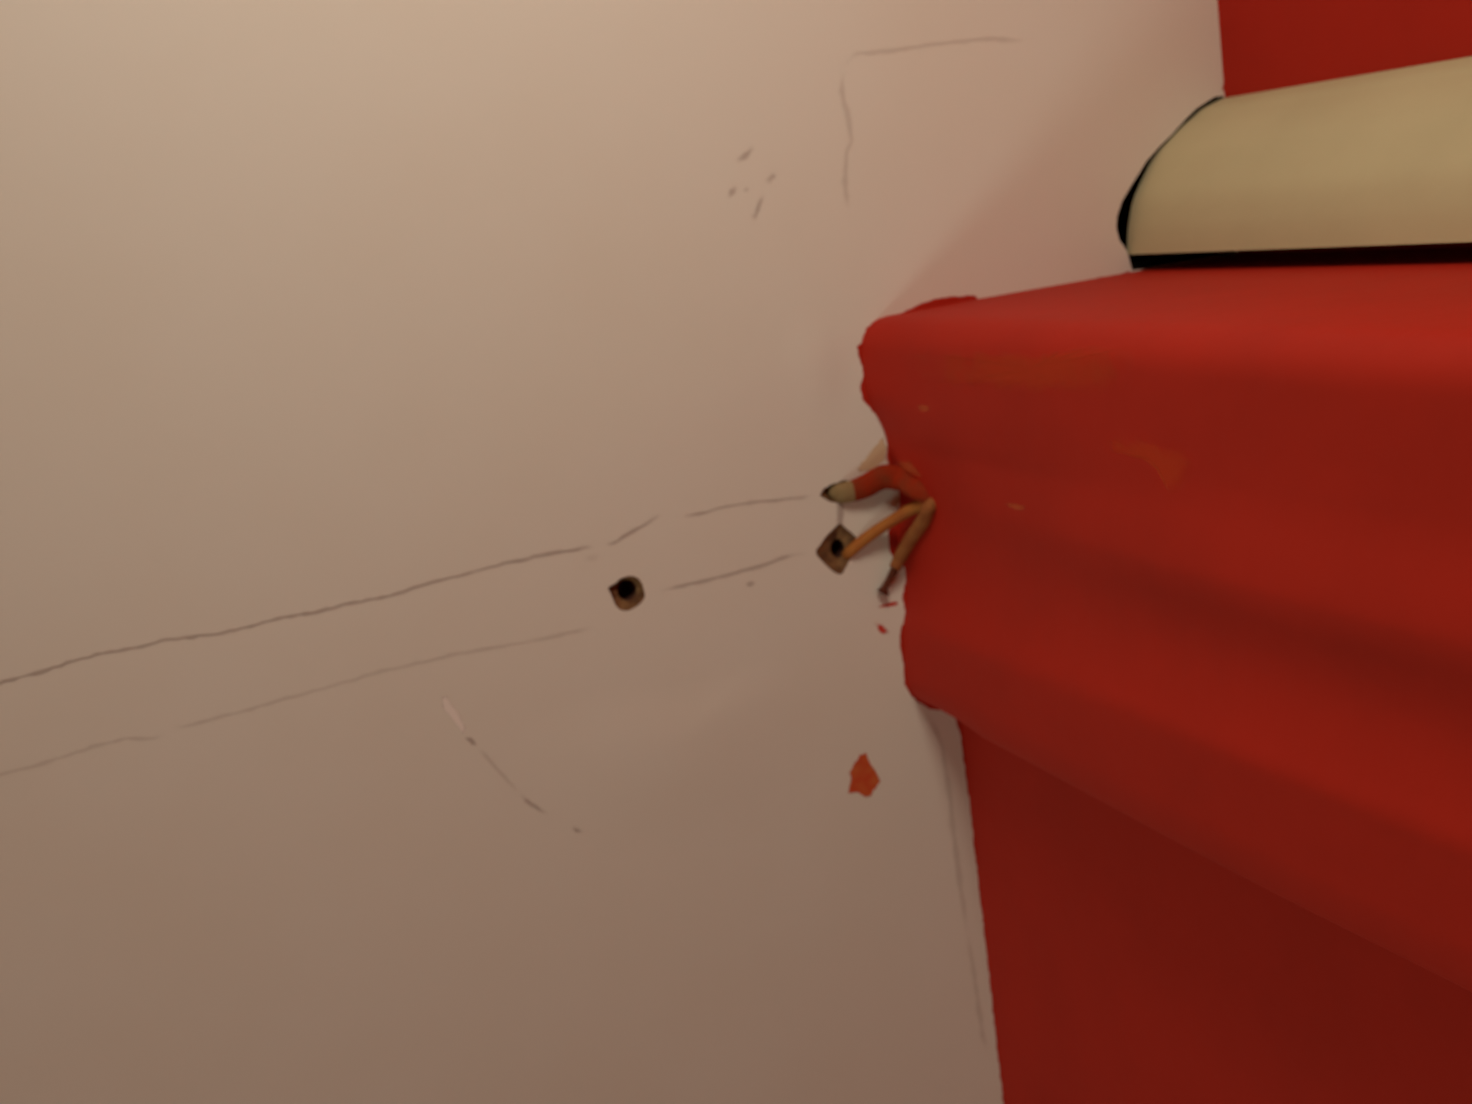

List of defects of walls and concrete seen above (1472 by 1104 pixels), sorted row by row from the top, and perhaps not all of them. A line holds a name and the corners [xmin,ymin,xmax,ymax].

flaking render [820,438,886,503]
spalling [816,523,856,574]